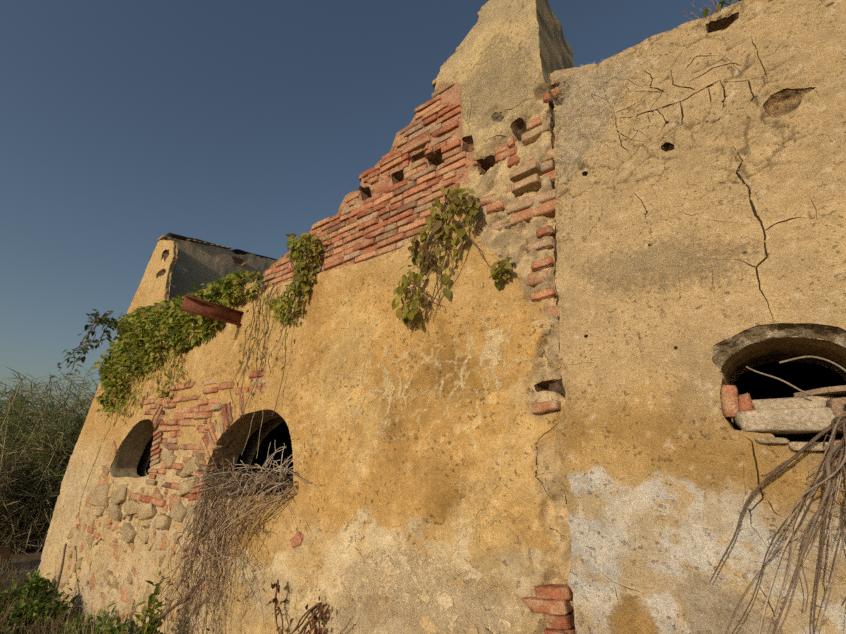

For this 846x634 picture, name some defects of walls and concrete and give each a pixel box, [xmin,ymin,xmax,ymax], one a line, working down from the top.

spalling [706,12,739,33]
spalling [545,80,570,105]
crack [468,35,784,156]
spalling [763,87,816,118]
spalling [491,112,527,142]
spalling [462,135,474,152]
crack [677,146,823,321]
damp [429,317,529,402]
damp [343,347,427,436]
crack [549,375,566,396]